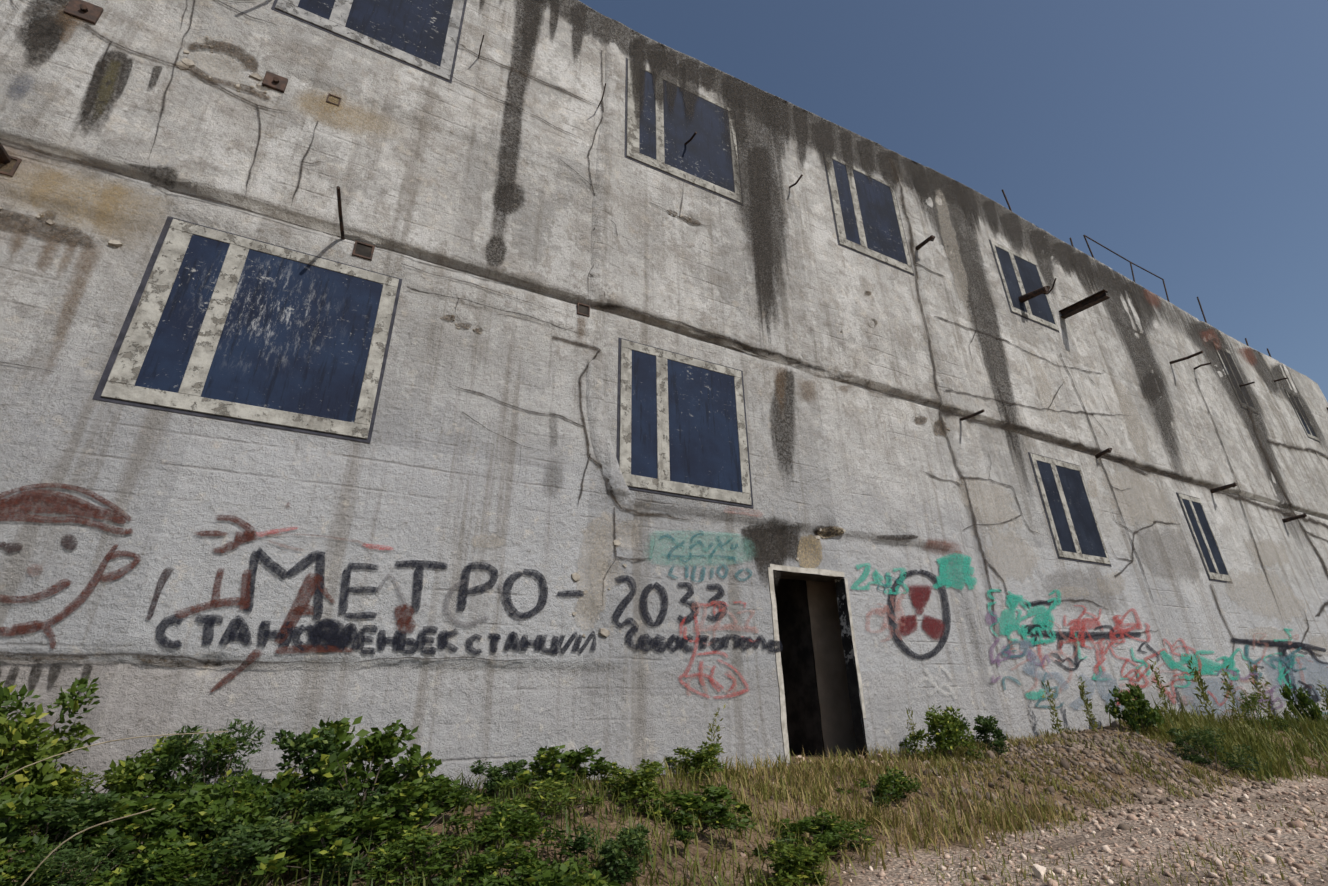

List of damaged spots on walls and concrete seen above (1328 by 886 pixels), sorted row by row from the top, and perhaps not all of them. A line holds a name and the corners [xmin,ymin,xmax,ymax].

leakage [11,0,73,97]
leakage [80,51,132,132]
leakage [148,66,162,87]
leakage [486,0,1325,525]
crack [0,0,1328,688]
leakage [0,664,61,691]